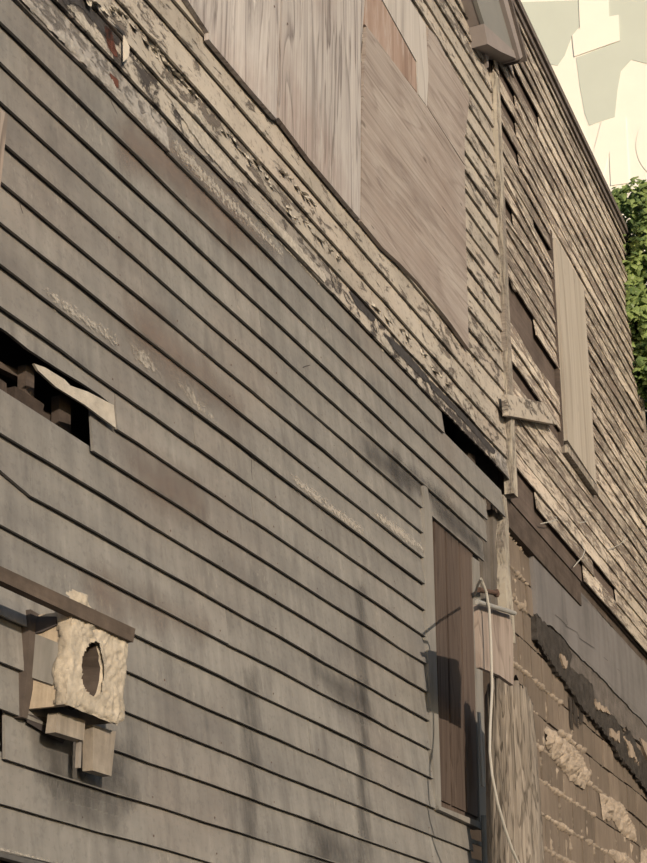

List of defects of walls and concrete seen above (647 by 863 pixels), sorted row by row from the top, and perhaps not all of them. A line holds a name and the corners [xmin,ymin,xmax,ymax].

peeling [22,0,171,152]
peeling [63,0,199,99]
flaking render [569,648,647,746]
spalling [545,726,591,790]
spalling [599,793,637,842]
spalling [609,848,647,863]